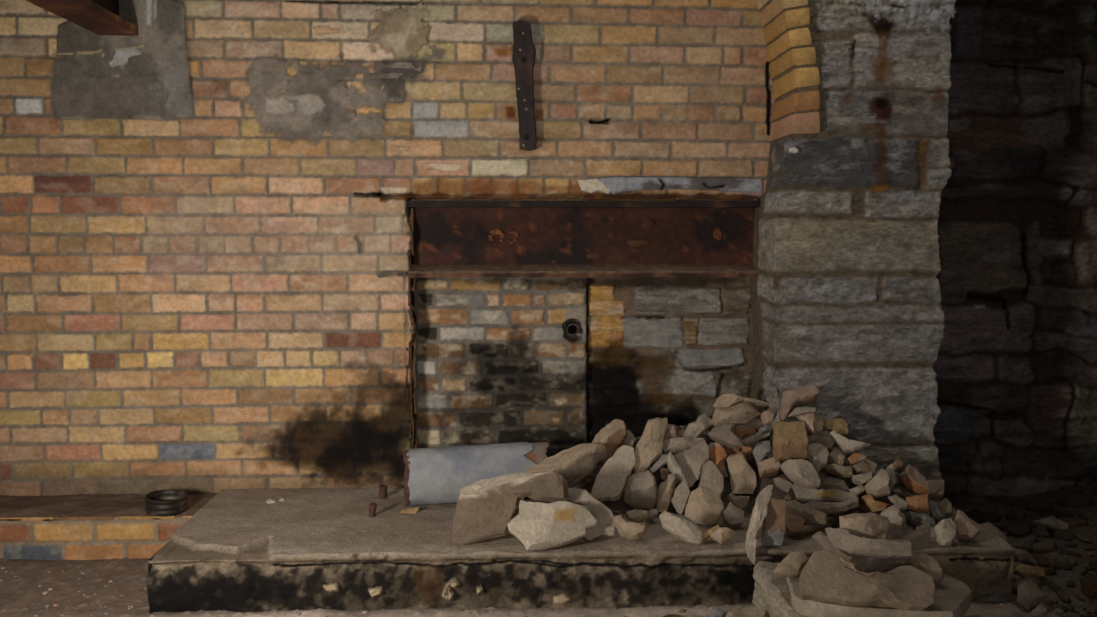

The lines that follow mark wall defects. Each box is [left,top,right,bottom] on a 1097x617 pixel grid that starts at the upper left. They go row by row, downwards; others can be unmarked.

rust [867,15,894,36]
rust [863,96,892,193]
rust [380,193,760,201]
damp [582,344,711,440]